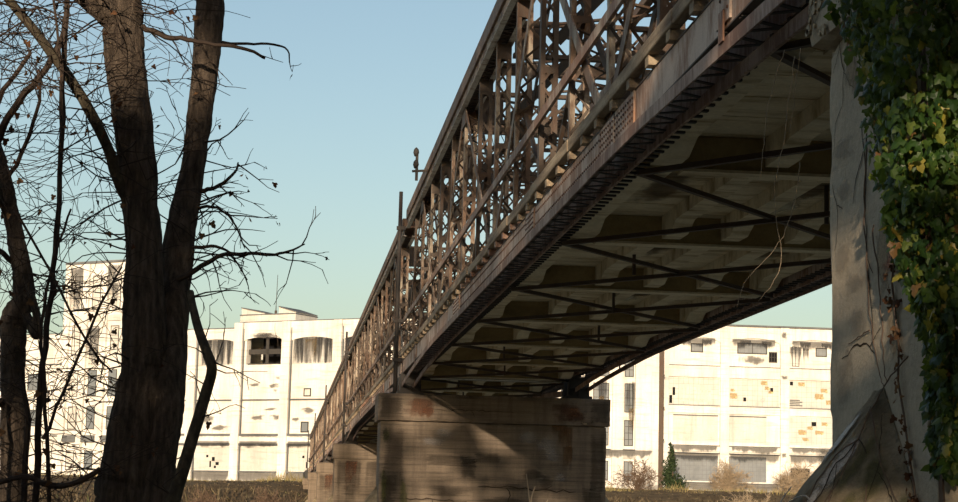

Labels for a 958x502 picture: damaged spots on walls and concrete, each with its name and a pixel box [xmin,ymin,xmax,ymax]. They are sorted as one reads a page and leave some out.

crack [833,121,881,359]
crack [406,486,573,502]